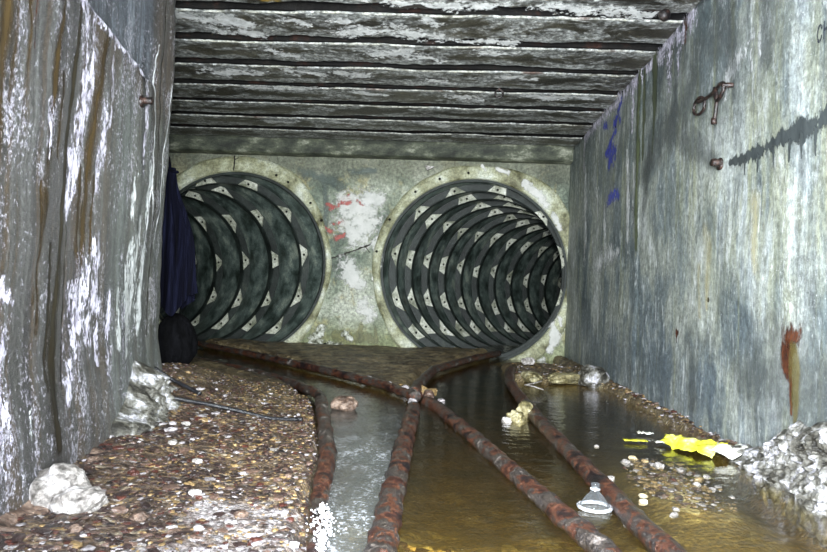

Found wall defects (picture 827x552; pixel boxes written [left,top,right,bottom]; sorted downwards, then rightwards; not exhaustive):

leakage [724,31,762,101]
rust [32,0,66,335]
rust [74,34,110,280]
leakage [728,104,827,175]
leakage [43,0,182,454]
leakage [0,275,14,307]
leakage [0,324,13,481]
rust [781,322,802,423]
leakage [0,500,50,533]